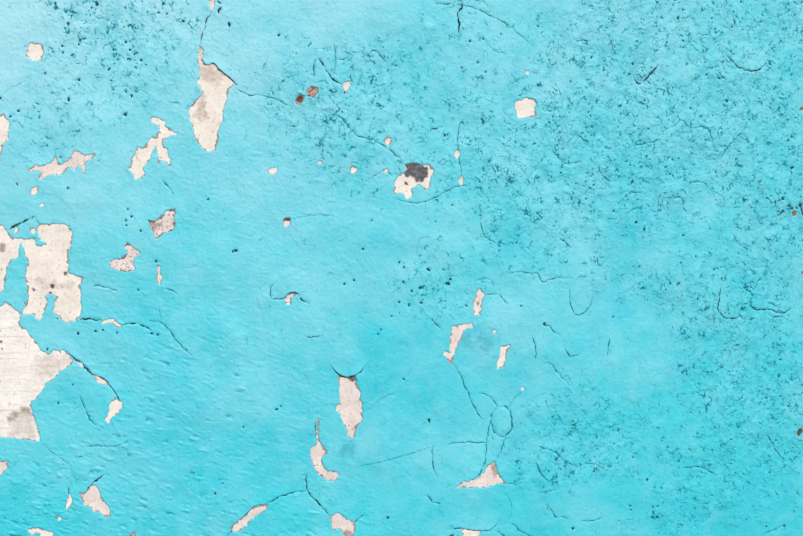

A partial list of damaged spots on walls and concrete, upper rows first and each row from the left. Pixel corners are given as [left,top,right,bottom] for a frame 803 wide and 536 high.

peeling [188,46,238,152]
peeling [129,117,177,179]
peeling [393,162,434,199]
peeling [0,223,84,441]
peeling [443,289,484,365]
peeling [310,418,339,481]
peeling [331,360,368,439]
crack [362,447,437,475]
peeling [455,462,506,488]
crack [451,366,521,479]
crack [454,480,529,536]
crack [536,446,604,521]